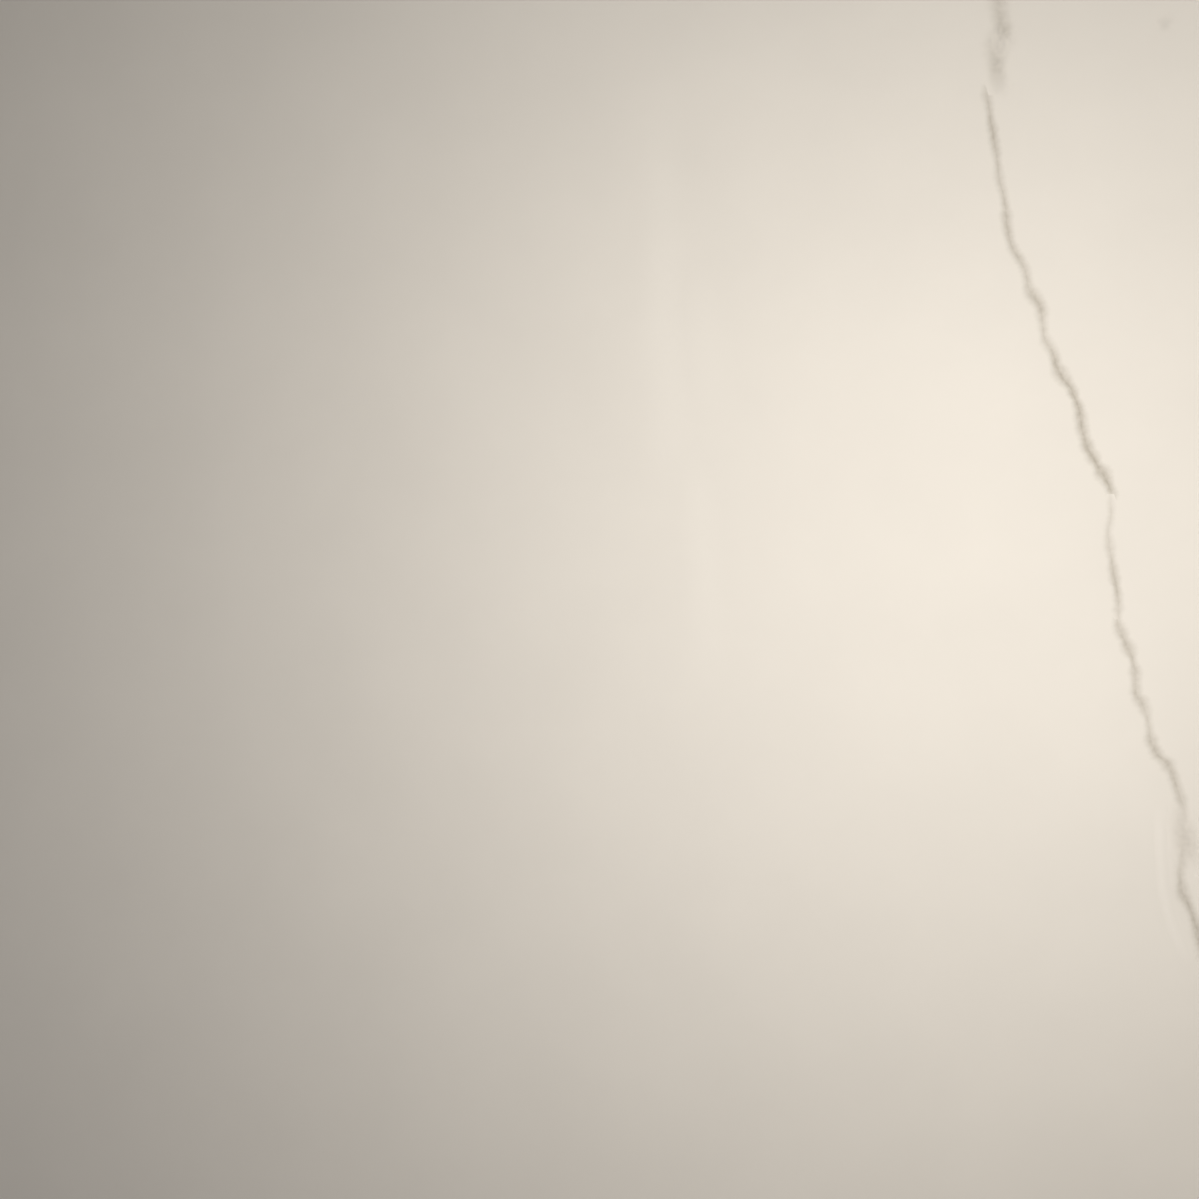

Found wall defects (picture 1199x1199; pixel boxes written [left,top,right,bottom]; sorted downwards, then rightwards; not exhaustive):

crack [978,0,1199,969]